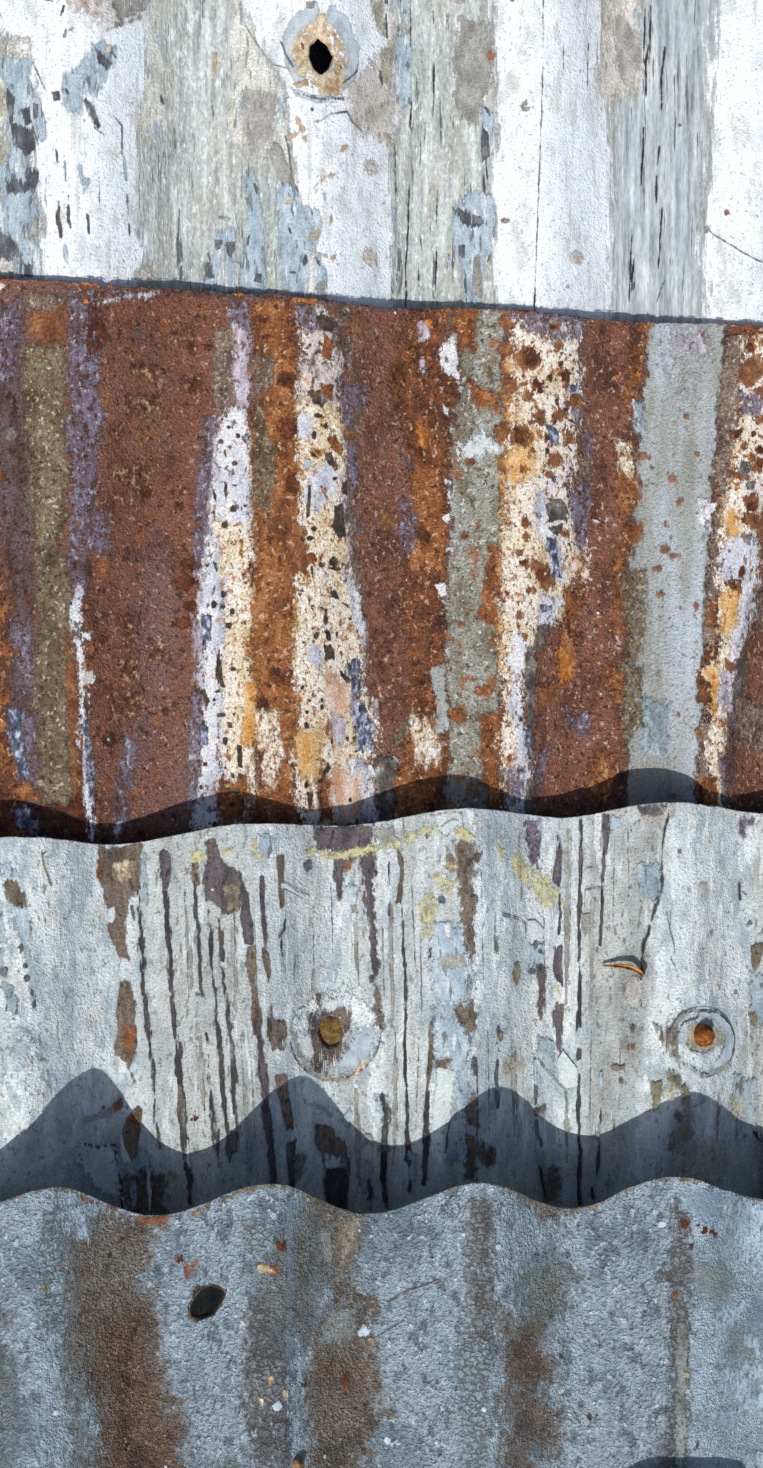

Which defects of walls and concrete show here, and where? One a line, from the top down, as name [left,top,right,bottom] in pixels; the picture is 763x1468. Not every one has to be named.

peeling [384,0,412,136]
peeling [0,15,141,280]
peeling [447,0,510,307]
corrosion [0,278,392,844]
corrosion [385,307,763,819]
peeling [69,86,676,1215]
corrosion [415,840,482,966]
peeling [699,883,708,900]
peeling [748,944,763,1029]
peeling [717,1073,763,1197]
corrosion [253,1241,288,1277]